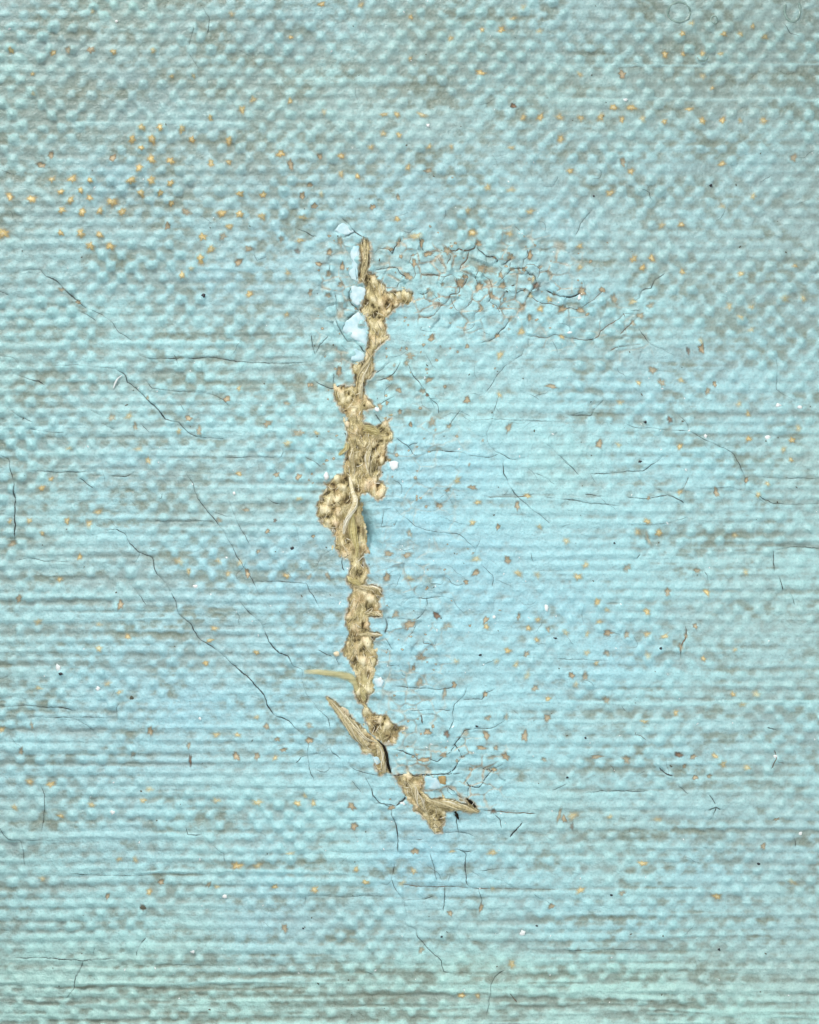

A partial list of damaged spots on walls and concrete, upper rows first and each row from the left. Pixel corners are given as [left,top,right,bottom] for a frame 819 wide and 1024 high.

crack [103,367,244,458]
crack [304,229,664,455]
crack [187,478,316,611]
peeling [296,223,479,833]
crack [173,596,299,731]
crack [333,665,535,909]